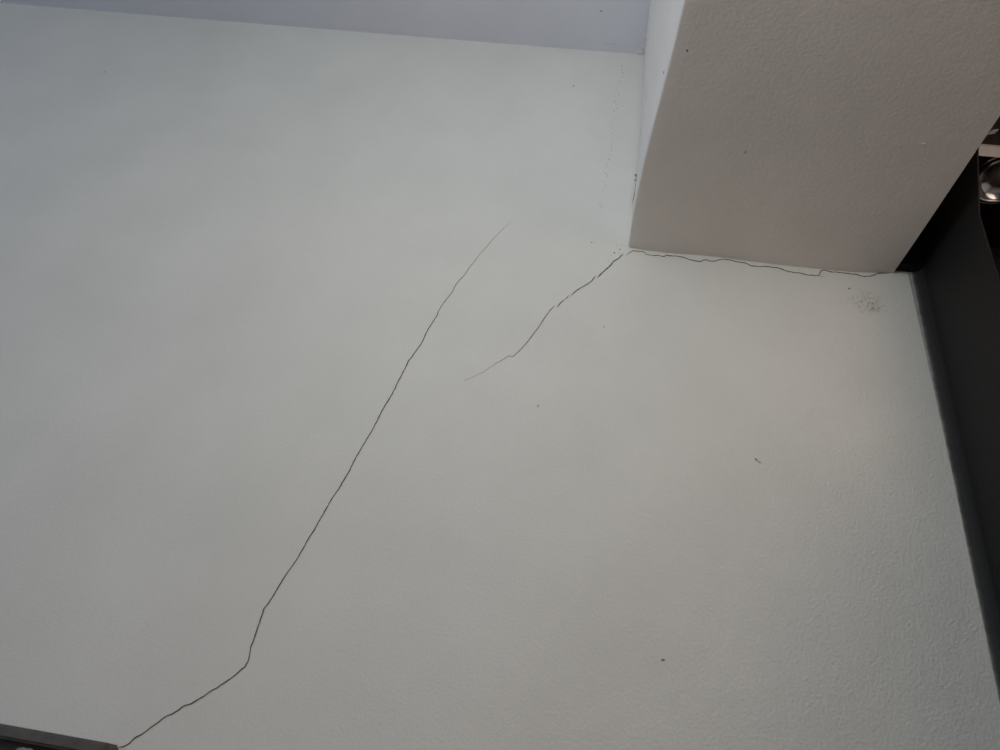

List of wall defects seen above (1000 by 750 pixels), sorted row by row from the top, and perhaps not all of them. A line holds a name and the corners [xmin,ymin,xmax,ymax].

crack [117,228,504,748]
crack [469,250,887,379]